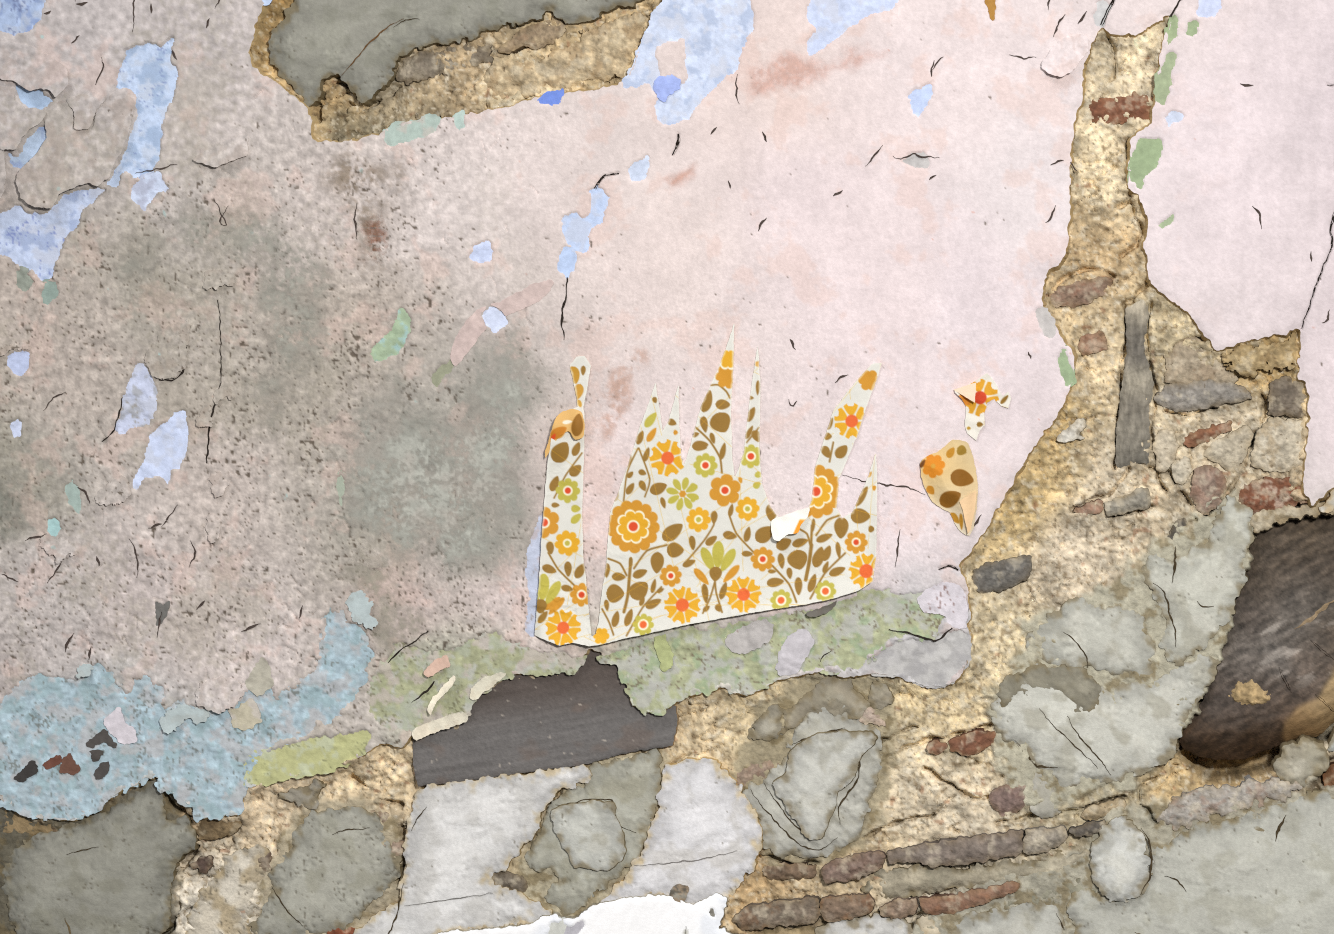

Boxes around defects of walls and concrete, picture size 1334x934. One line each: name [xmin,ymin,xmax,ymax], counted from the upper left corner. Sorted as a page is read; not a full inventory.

peeling [0,0,178,305]
peeling [193,134,249,167]
peeling [383,110,465,146]
peeling [537,88,564,106]
peeling [622,0,754,125]
peeling [807,0,899,56]
peeling [1041,0,1112,77]
peeling [1127,0,1222,189]
crack [1301,216,1334,329]
peeling [1035,306,1077,387]
peeling [0,512,972,823]